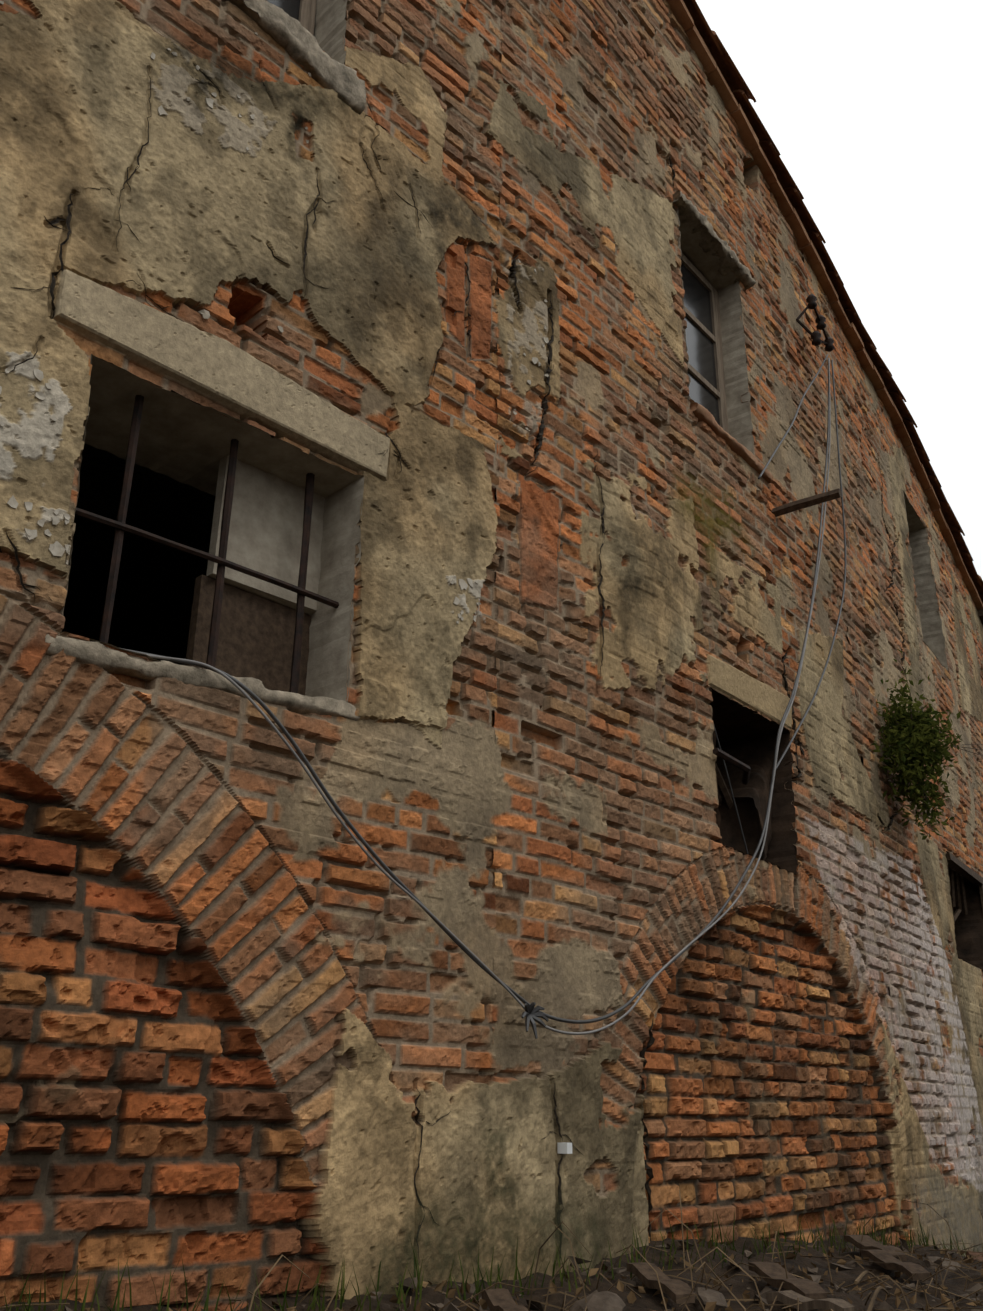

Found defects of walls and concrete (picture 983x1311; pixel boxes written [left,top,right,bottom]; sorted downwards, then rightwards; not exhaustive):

peeling [117,0,315,162]
crack [1,65,212,373]
crack [266,171,336,298]
spalling [164,277,401,436]
peeling [500,250,553,445]
peeling [447,573,486,626]